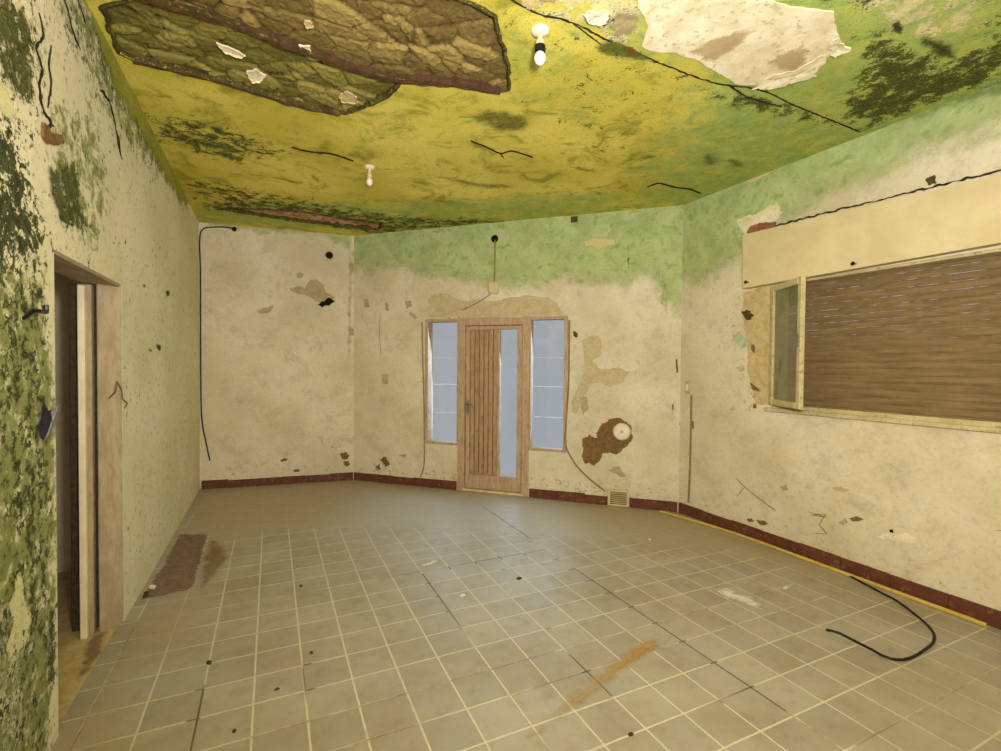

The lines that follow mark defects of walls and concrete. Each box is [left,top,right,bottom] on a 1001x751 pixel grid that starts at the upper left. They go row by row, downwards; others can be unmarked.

mould [0,0,35,104]
crack [511,0,613,45]
peeling [584,0,851,90]
water stain [922,38,955,58]
crack [641,54,860,132]
water stain [329,83,1001,307]
crack [776,169,1001,226]
peeling [290,273,335,307]
spalling [733,286,771,408]
spalling [582,418,633,477]
water stain [145,534,226,598]
corrosion [597,643,654,681]